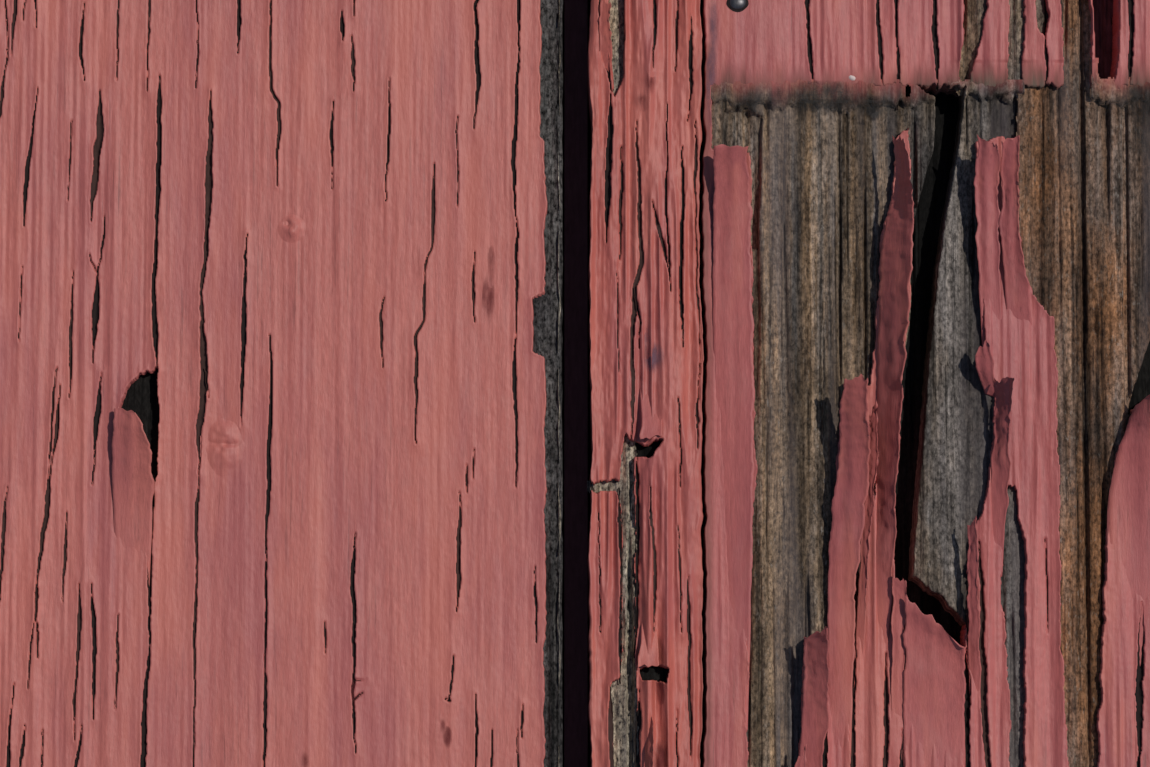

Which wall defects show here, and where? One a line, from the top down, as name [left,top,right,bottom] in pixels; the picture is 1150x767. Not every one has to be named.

crack [6,0,155,767]
peeling [112,369,159,586]
crack [147,0,162,373]
crack [193,0,213,767]
crack [240,234,273,767]
crack [414,0,481,444]
crack [511,0,520,487]
peeling [638,624,659,668]
crack [598,0,700,767]
peeling [645,718,654,767]
peeling [711,0,1150,767]
crack [1135,617,1144,767]